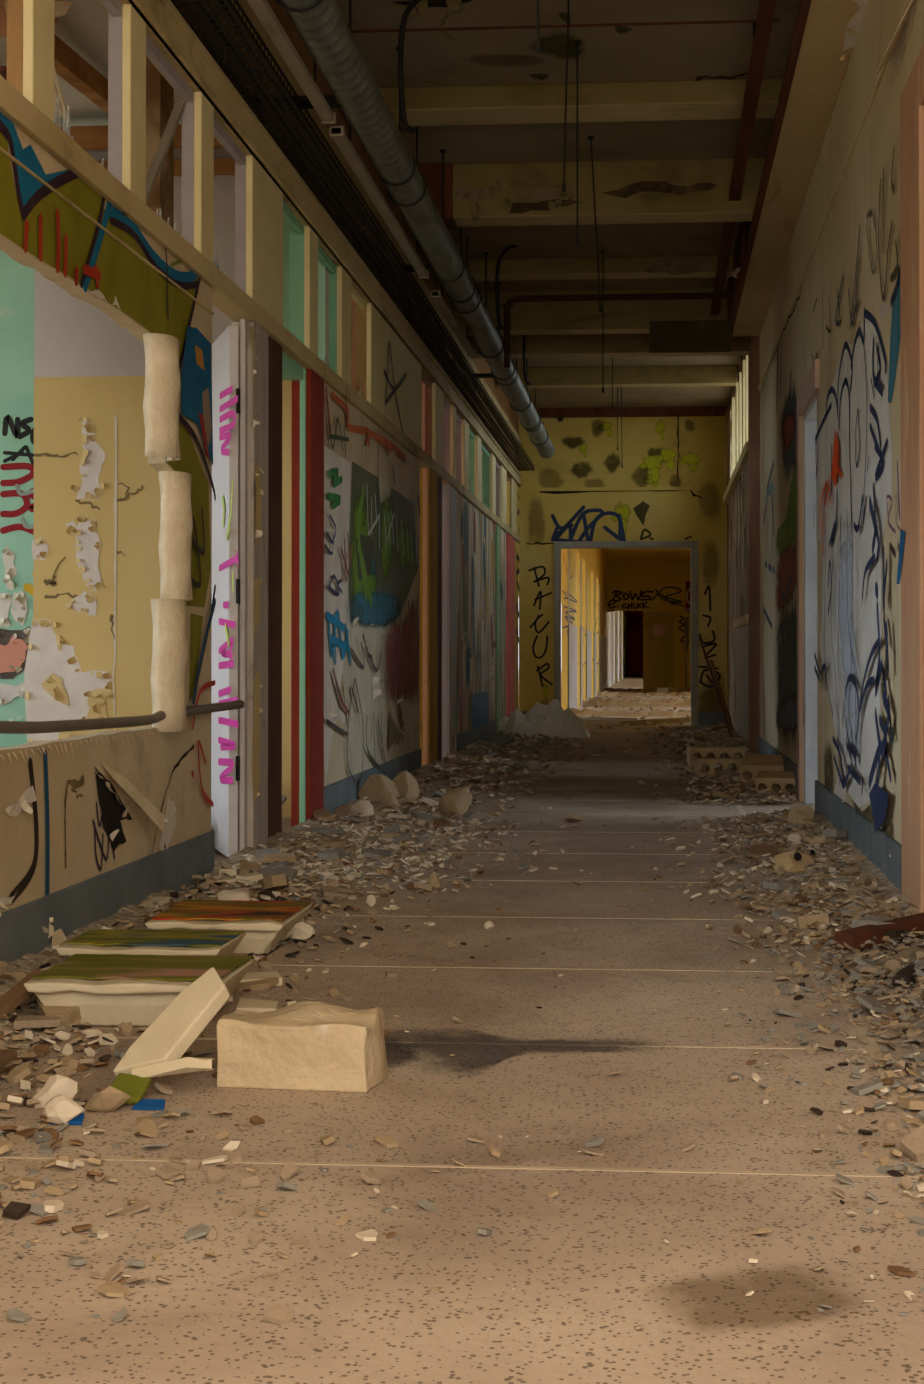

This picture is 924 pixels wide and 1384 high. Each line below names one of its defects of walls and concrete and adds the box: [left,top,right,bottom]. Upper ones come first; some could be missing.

peeling [31,537,48,560]
peeling [0,547,113,742]
peeling [65,416,105,616]